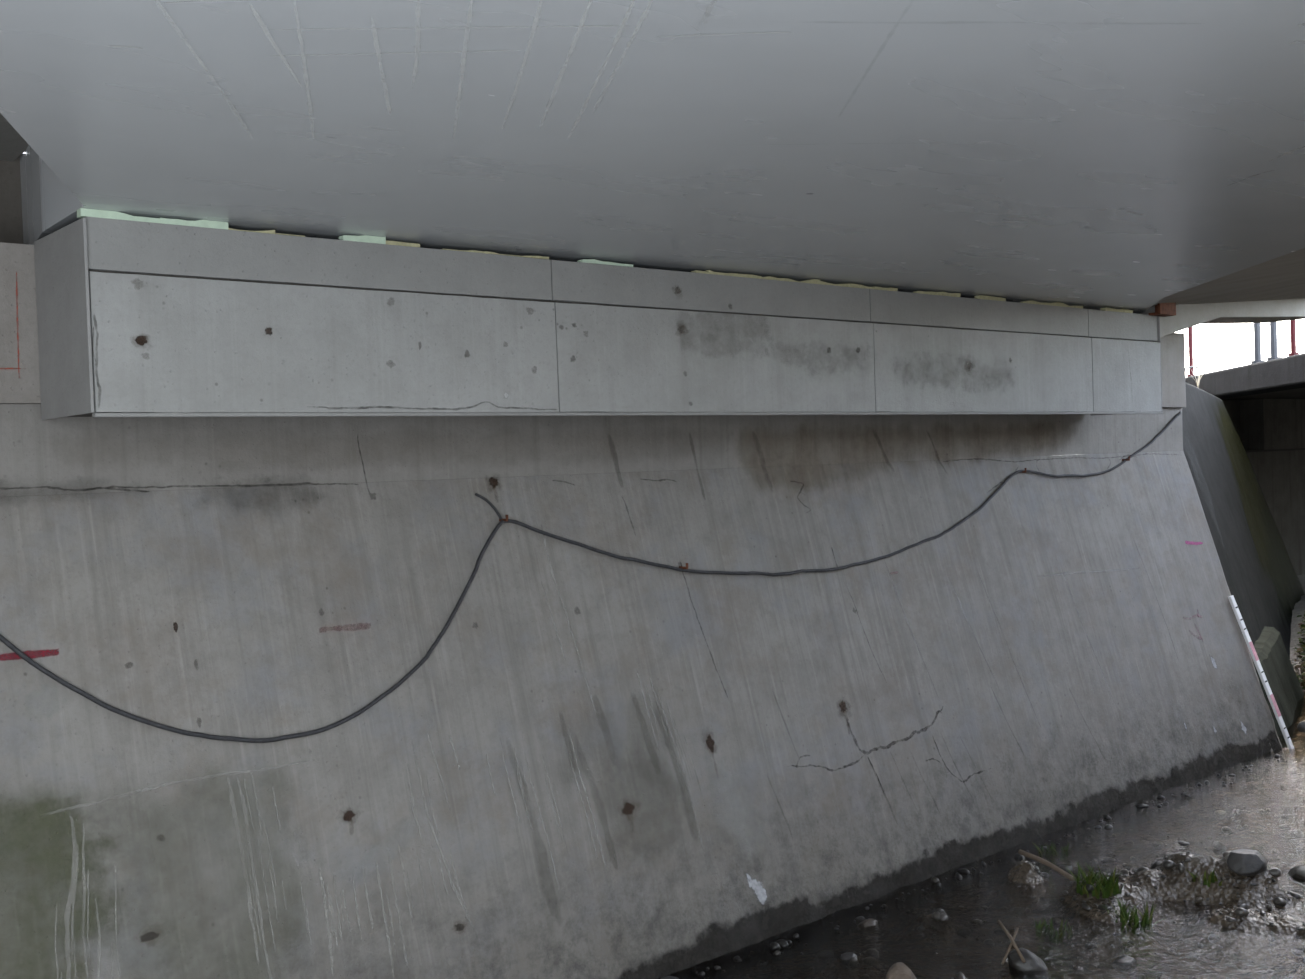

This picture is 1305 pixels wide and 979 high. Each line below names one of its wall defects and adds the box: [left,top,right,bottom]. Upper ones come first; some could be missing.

crack [792,707,991,785]
leakage [618,731,1285,979]